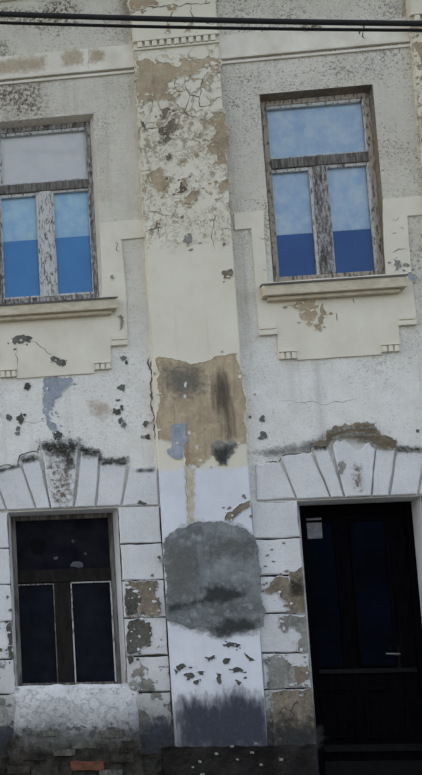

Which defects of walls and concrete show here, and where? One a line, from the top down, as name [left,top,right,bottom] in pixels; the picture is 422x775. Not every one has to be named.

peeling [127,0,180,14]
peeling [129,56,231,219]
peeling [283,299,333,333]
spalling [23,355,76,441]
peeling [140,350,268,468]
spalling [313,422,397,448]
water stain [169,546,241,610]
spalling [124,574,162,665]
peeling [173,641,255,686]
water stain [215,618,255,636]
spalling [262,566,316,746]
water stain [141,689,267,748]